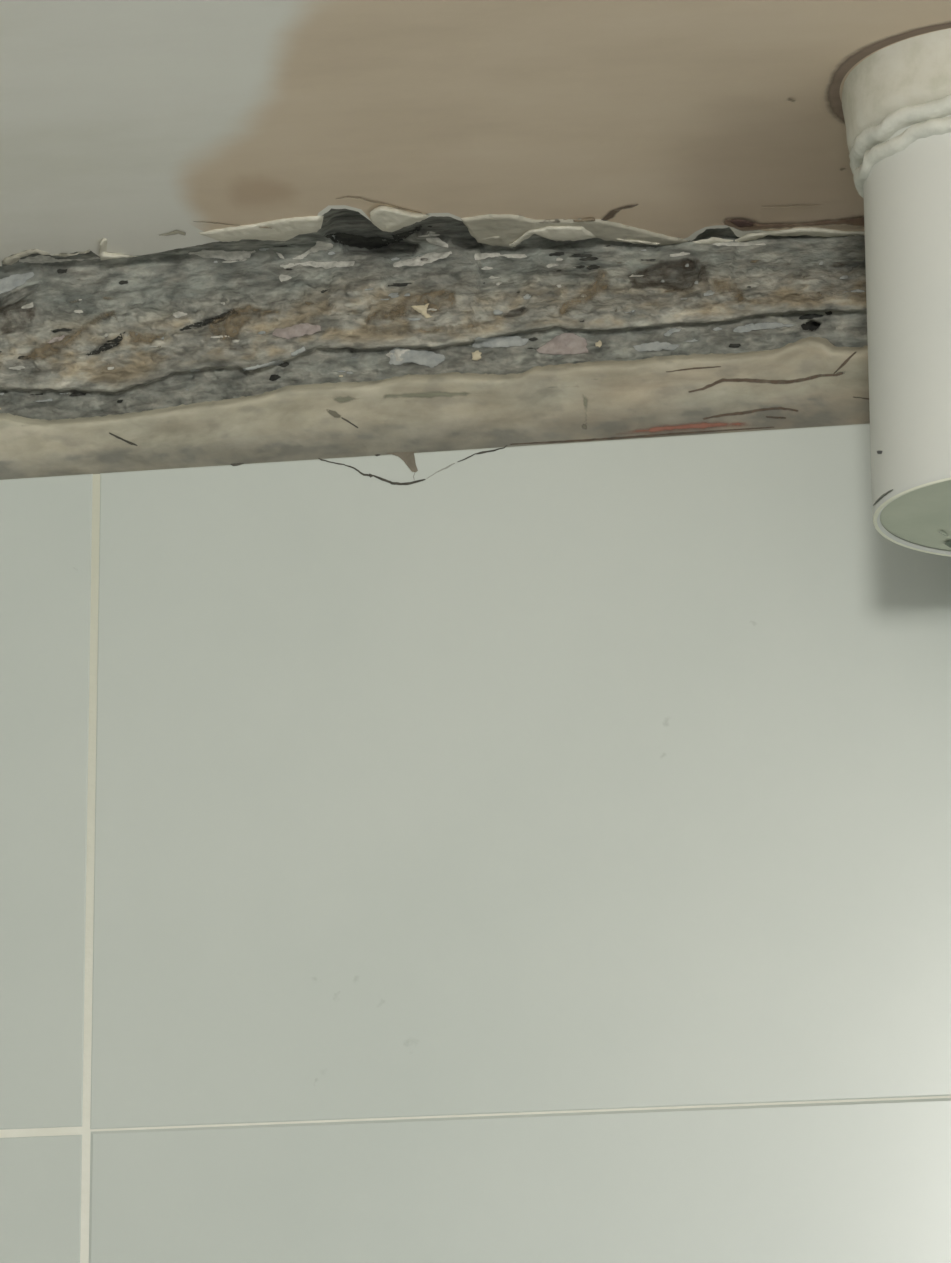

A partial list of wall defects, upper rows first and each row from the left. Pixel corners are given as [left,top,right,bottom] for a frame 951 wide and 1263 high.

leakage [157,0,951,239]
crack [318,445,508,485]
spalling [0,206,870,480]
crack [666,352,869,420]